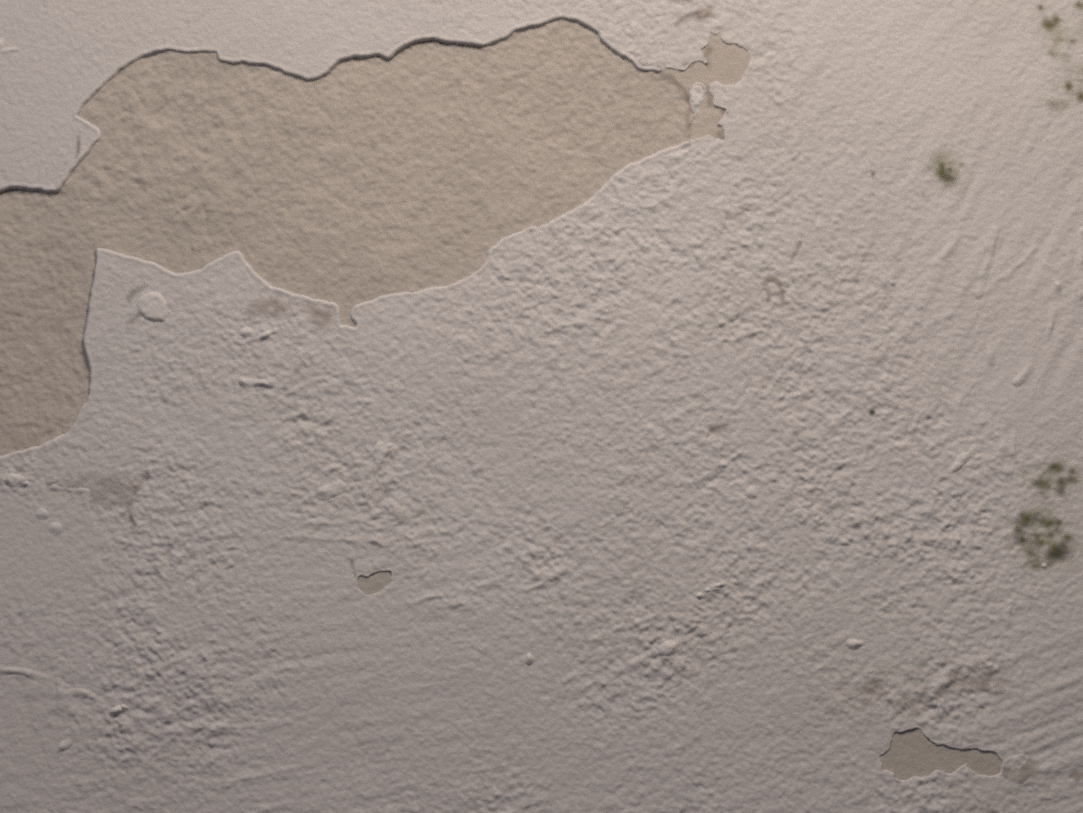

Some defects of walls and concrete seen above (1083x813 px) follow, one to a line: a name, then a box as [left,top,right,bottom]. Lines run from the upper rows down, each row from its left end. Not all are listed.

peeling [0,13,752,461]
peeling [354,568,394,597]
peeling [878,725,1029,784]